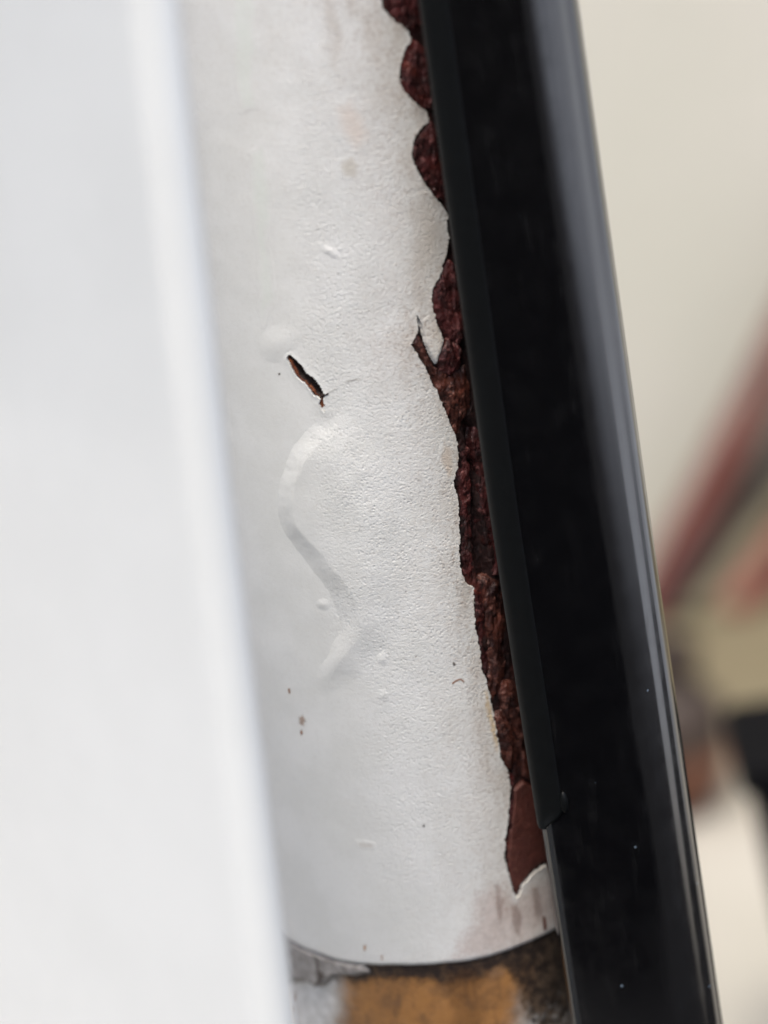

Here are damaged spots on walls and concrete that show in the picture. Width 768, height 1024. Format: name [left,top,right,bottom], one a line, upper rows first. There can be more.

corrosion [437,438,457,484]
peeling [382,0,545,895]
corrosion [480,686,500,758]
corrosion [316,916,561,1024]